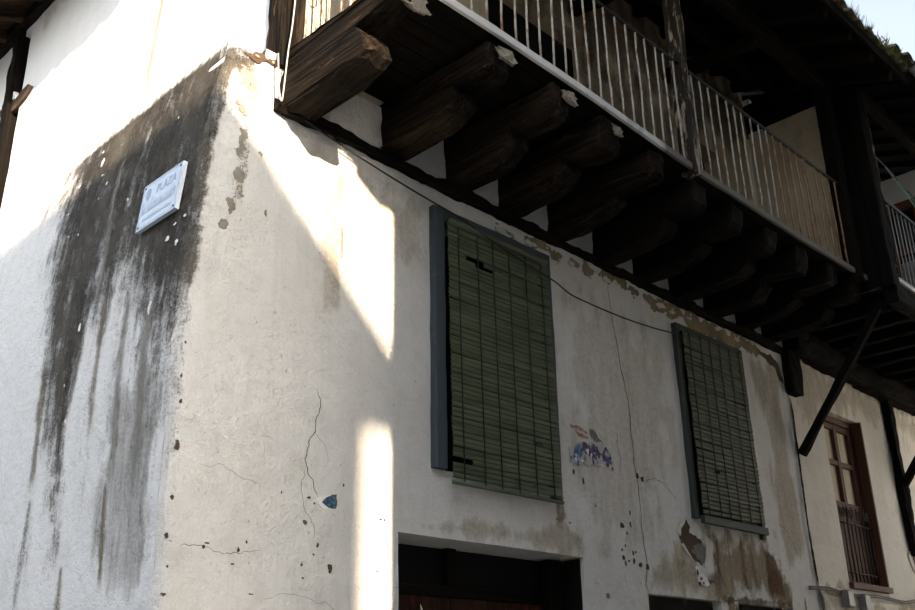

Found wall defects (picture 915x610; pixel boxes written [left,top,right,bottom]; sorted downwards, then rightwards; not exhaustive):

damp [30,39,256,555]
spalling [495,223,784,384]
damp [98,474,112,583]
crack [301,394,327,539]
crack [607,283,674,592]
spalling [677,517,715,587]